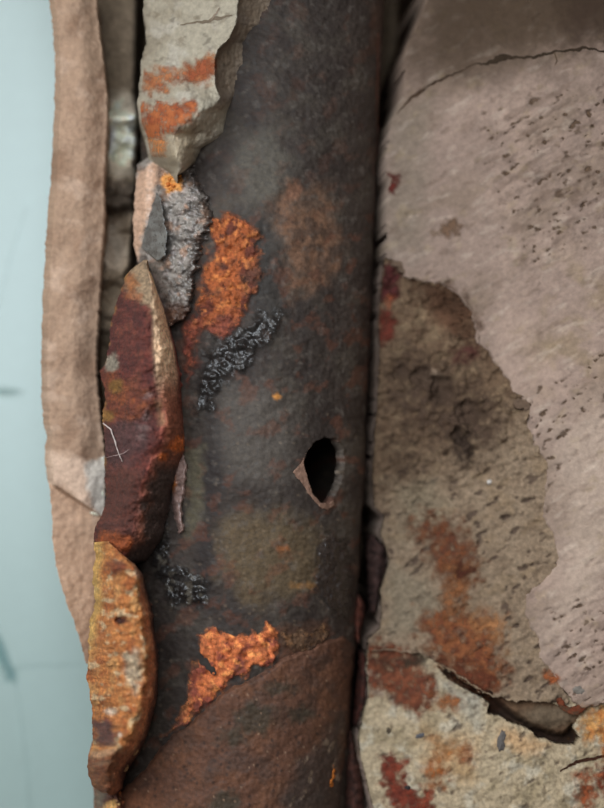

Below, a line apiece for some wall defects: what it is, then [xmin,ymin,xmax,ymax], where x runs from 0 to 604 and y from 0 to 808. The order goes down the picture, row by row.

rust [140,55,217,154]
crack [396,41,604,115]
rust [86,211,469,808]
spalling [357,258,604,808]
rust [409,510,513,694]
crack [441,663,493,695]
rust [582,706,604,755]
rust [574,766,604,808]